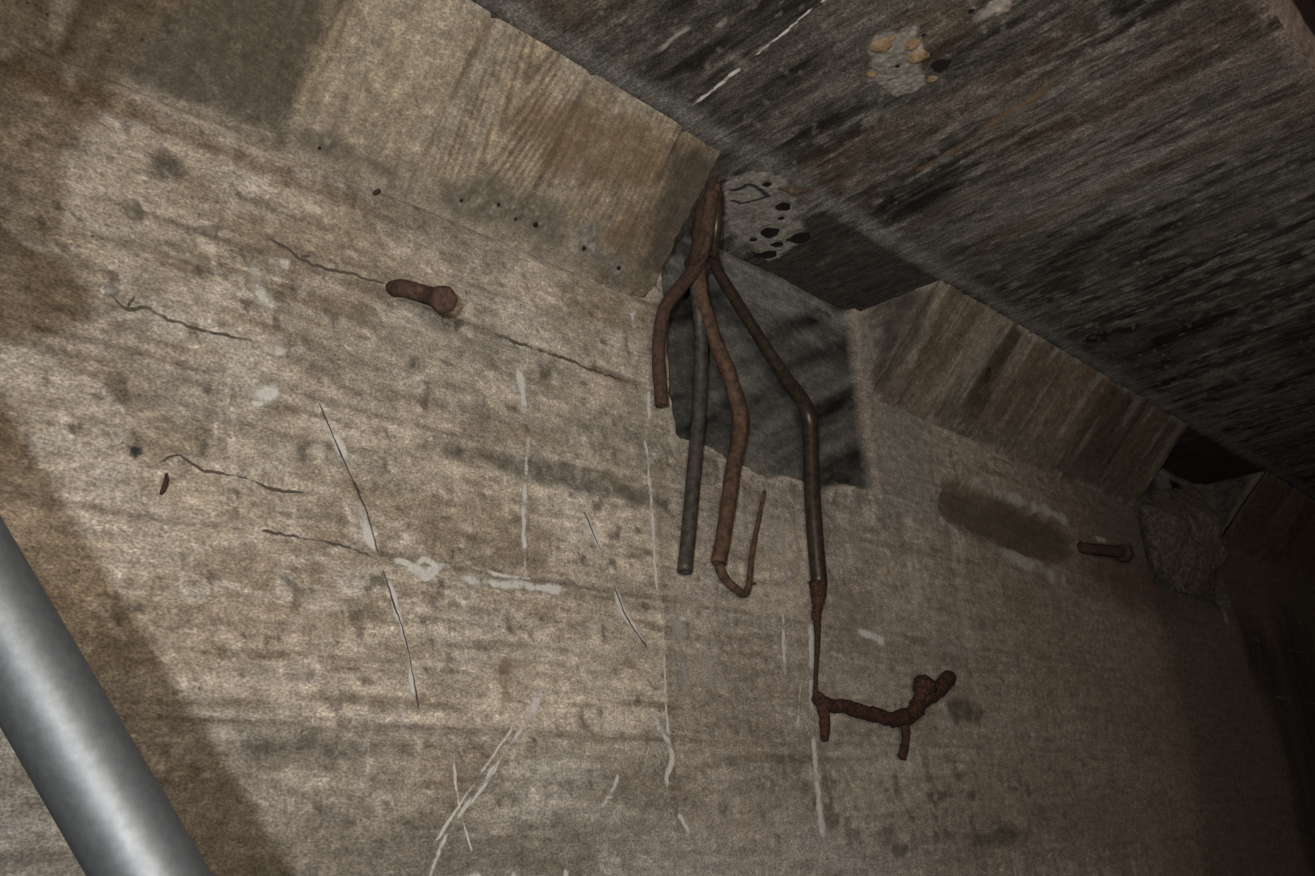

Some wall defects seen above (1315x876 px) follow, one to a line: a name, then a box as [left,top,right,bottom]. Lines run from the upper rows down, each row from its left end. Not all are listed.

spalling [866,26,951,97]
spalling [722,171,811,261]
crack [273,240,385,284]
crack [100,286,249,340]
crack [496,334,627,382]
crack [164,454,304,493]
corrosion [811,613,956,760]